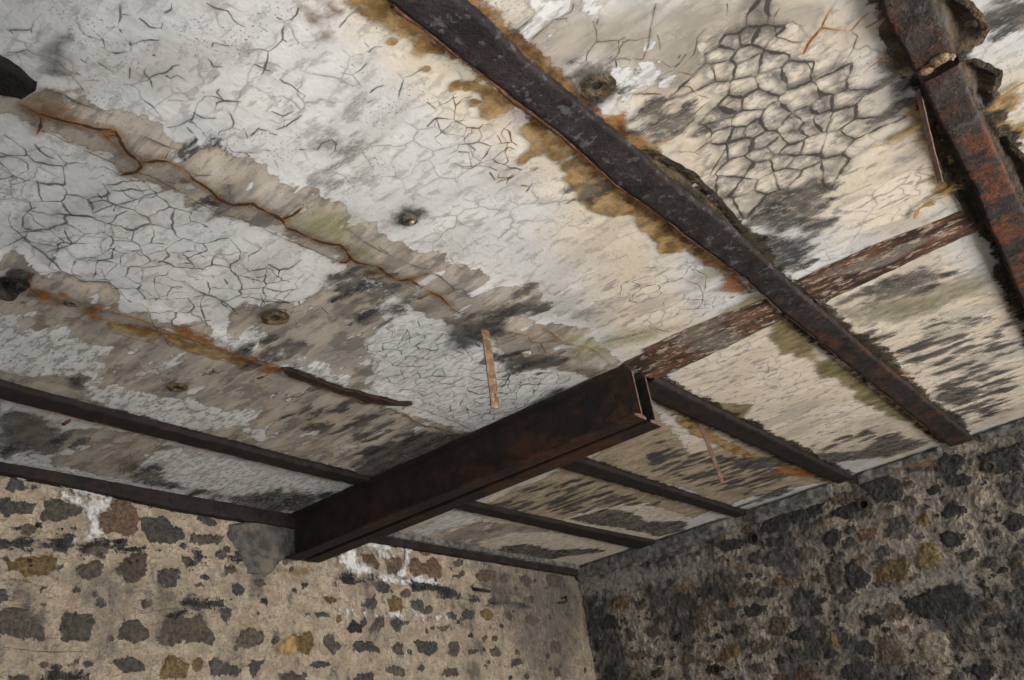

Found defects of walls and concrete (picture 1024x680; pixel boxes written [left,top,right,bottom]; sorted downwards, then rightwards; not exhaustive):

crack [0,3,716,434]
corrosion [350,0,756,298]
damp [564,175,615,205]
damp [624,97,725,143]
crack [493,0,919,220]
corrosion [887,96,935,151]
corrosion [927,158,954,207]
damp [324,264,413,328]
damp [450,282,553,349]
corrosion [86,306,414,411]
peeling [0,246,561,475]
corrosion [656,402,833,483]